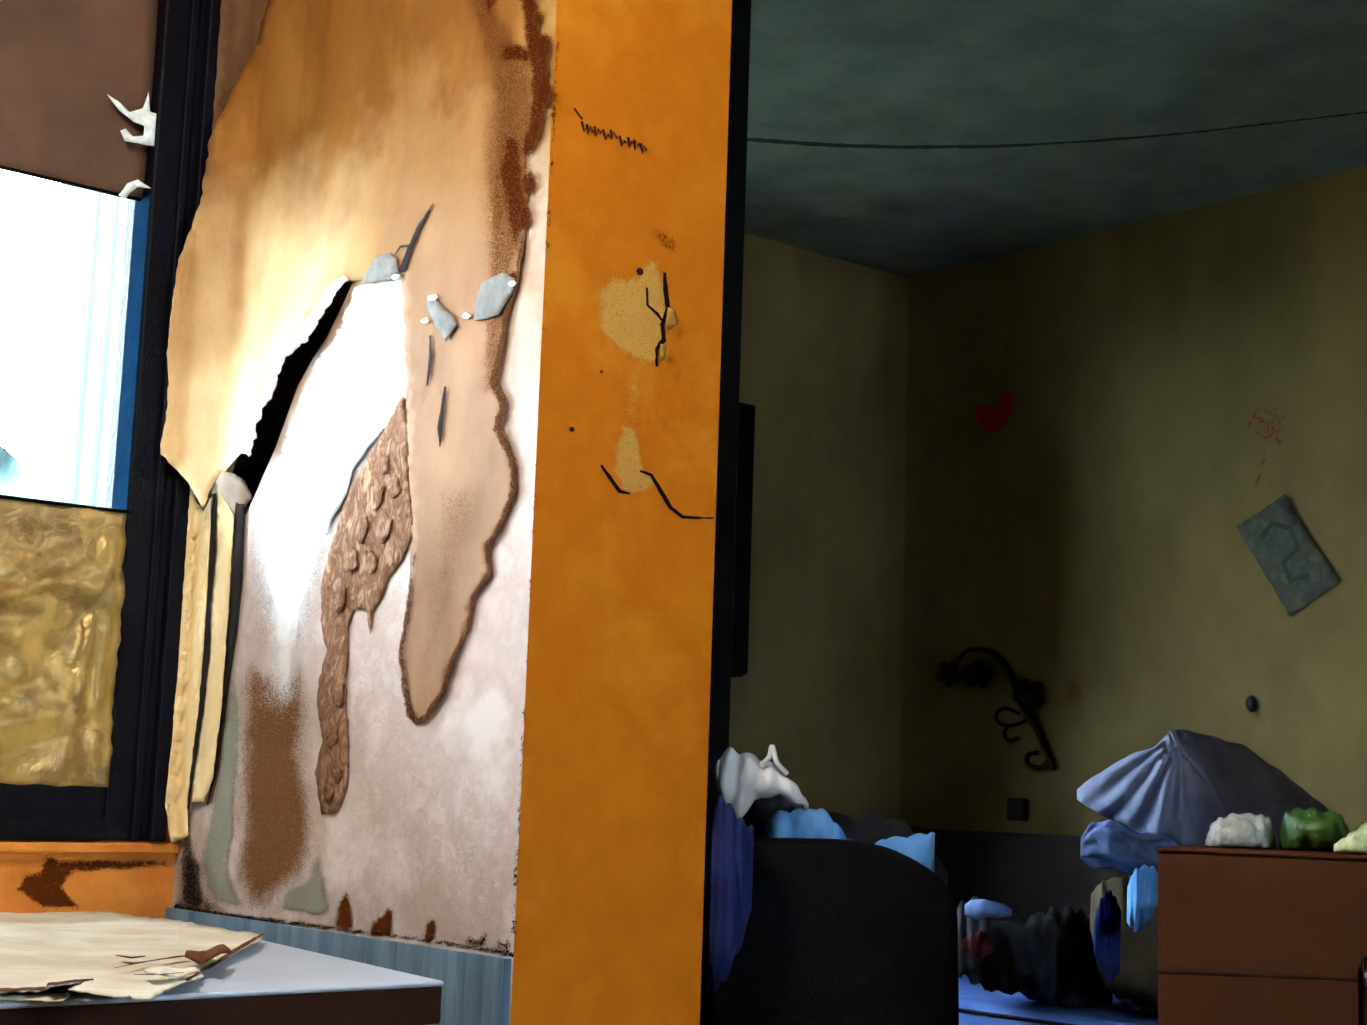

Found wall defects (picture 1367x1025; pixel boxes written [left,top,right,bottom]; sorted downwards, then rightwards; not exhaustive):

spalling [165,274,438,843]
peeling [594,255,678,495]
crack [600,465,714,519]
spalling [511,709,526,935]